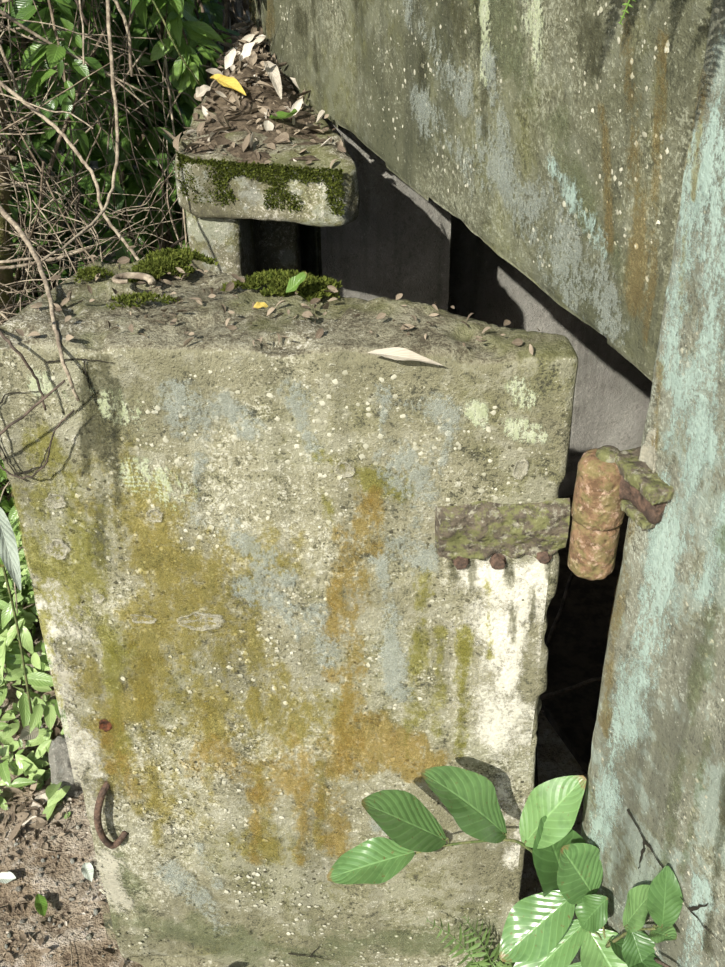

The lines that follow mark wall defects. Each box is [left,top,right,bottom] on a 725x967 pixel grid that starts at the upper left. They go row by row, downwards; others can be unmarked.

damp [548,158,607,257]
crack [627,809,664,869]
crack [680,897,722,943]